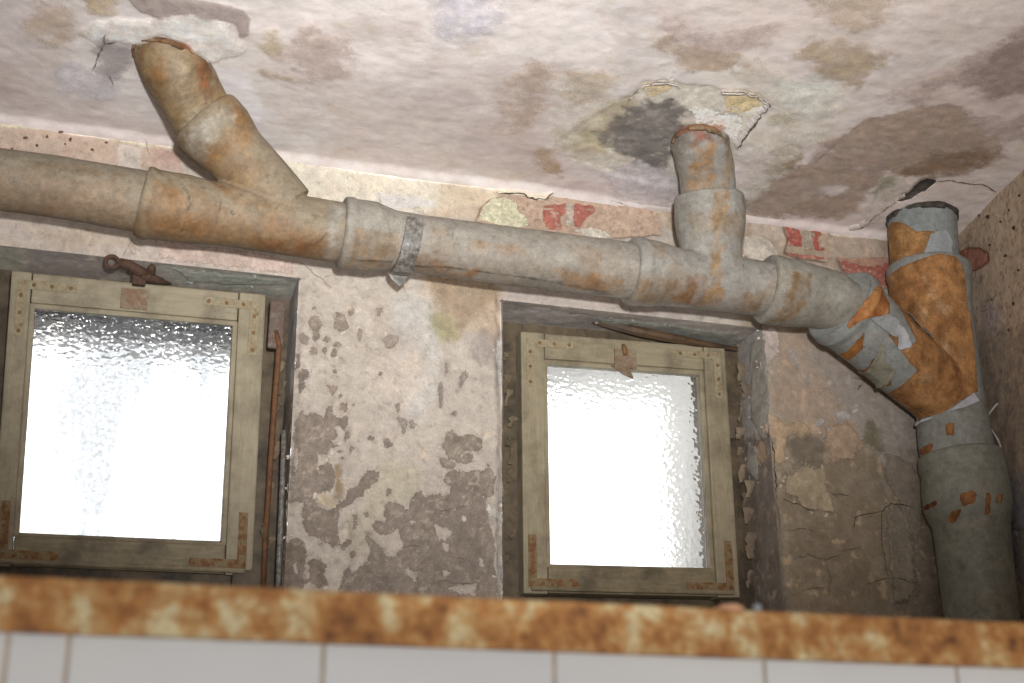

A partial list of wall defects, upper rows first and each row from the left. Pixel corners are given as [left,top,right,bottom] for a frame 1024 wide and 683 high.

crack [93,35,115,83]
flaking render [476,194,661,239]
damp [506,63,689,207]
damp [656,24,1024,221]
crack [849,194,906,231]
peeling [282,306,503,598]
peeling [595,317,865,517]
crack [768,435,913,596]